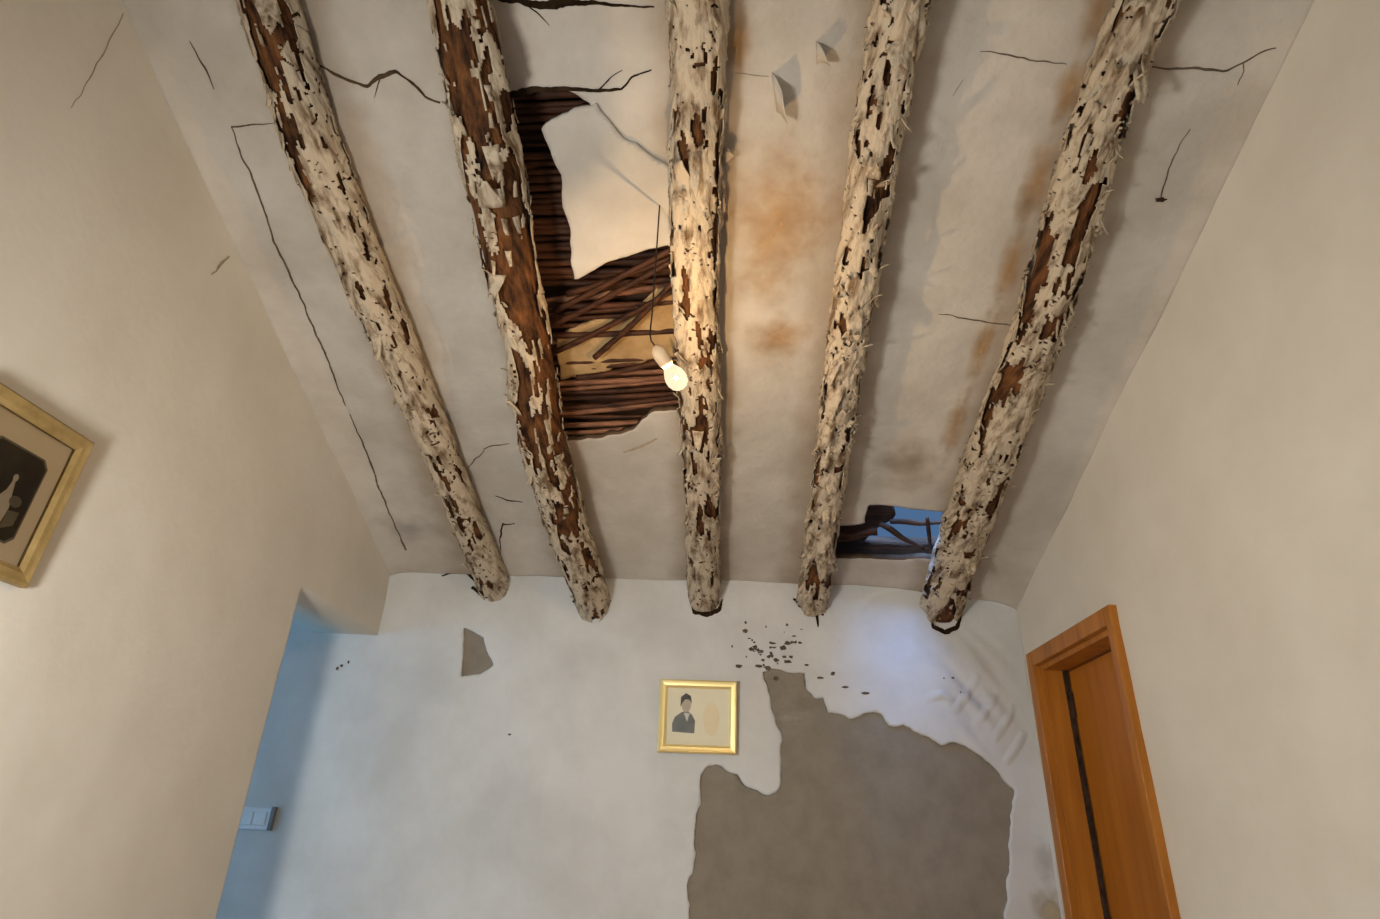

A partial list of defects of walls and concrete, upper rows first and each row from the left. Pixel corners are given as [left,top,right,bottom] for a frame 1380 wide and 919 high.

crack [498,0,654,25]
crack [319,64,440,104]
crack [1152,48,1276,85]
crack [1155,130,1190,202]
crack [231,123,407,550]
peeling [426,0,611,623]
spalling [687,0,1014,919]
spalling [462,628,493,676]